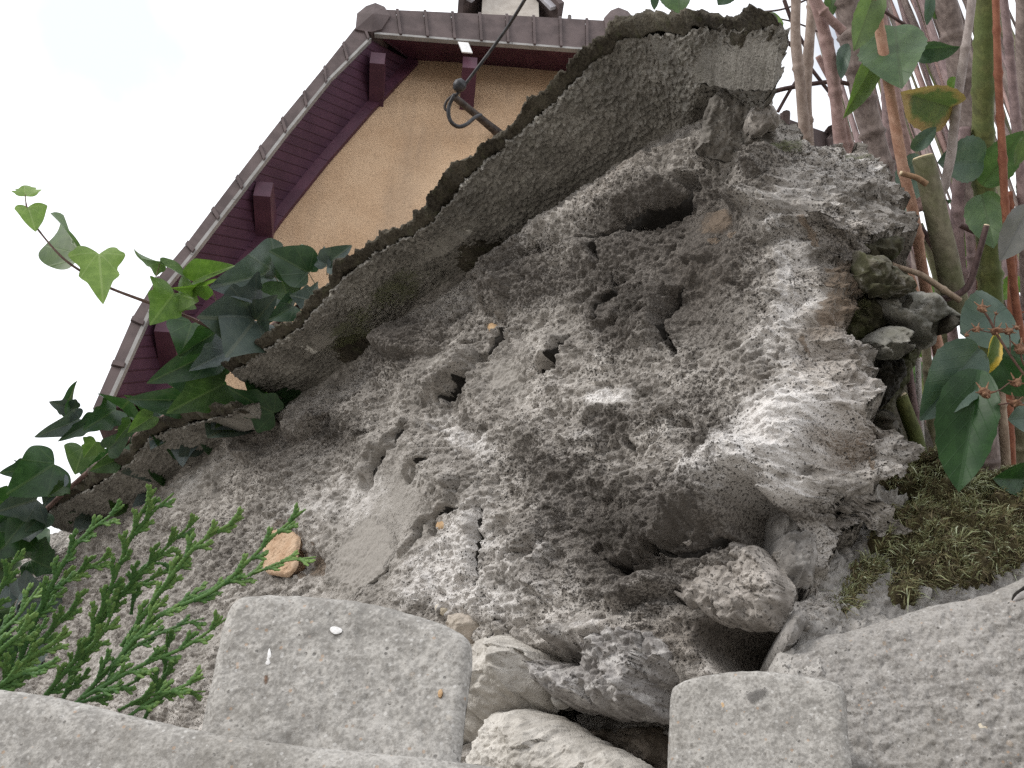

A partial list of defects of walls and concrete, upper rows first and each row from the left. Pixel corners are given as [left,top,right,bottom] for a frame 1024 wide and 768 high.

spalling [703,209,735,244]
spalling [817,263,862,327]
flaking render [263,530,326,579]
crack [438,506,484,585]